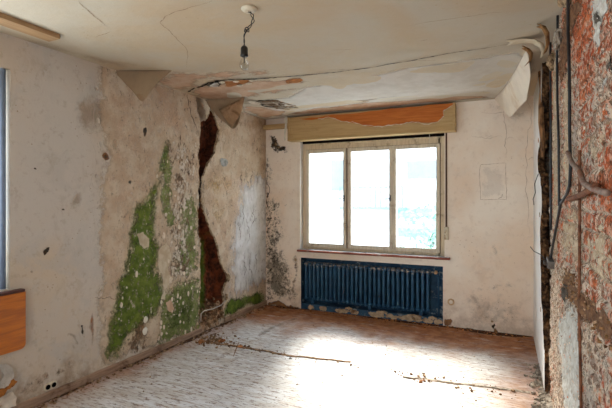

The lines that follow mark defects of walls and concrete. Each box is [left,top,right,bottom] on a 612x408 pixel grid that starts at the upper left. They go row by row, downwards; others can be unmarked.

water stain [104,140,200,361]
water stain [224,158,299,316]
peeling [89,24,551,392]
spalling [560,268,612,350]